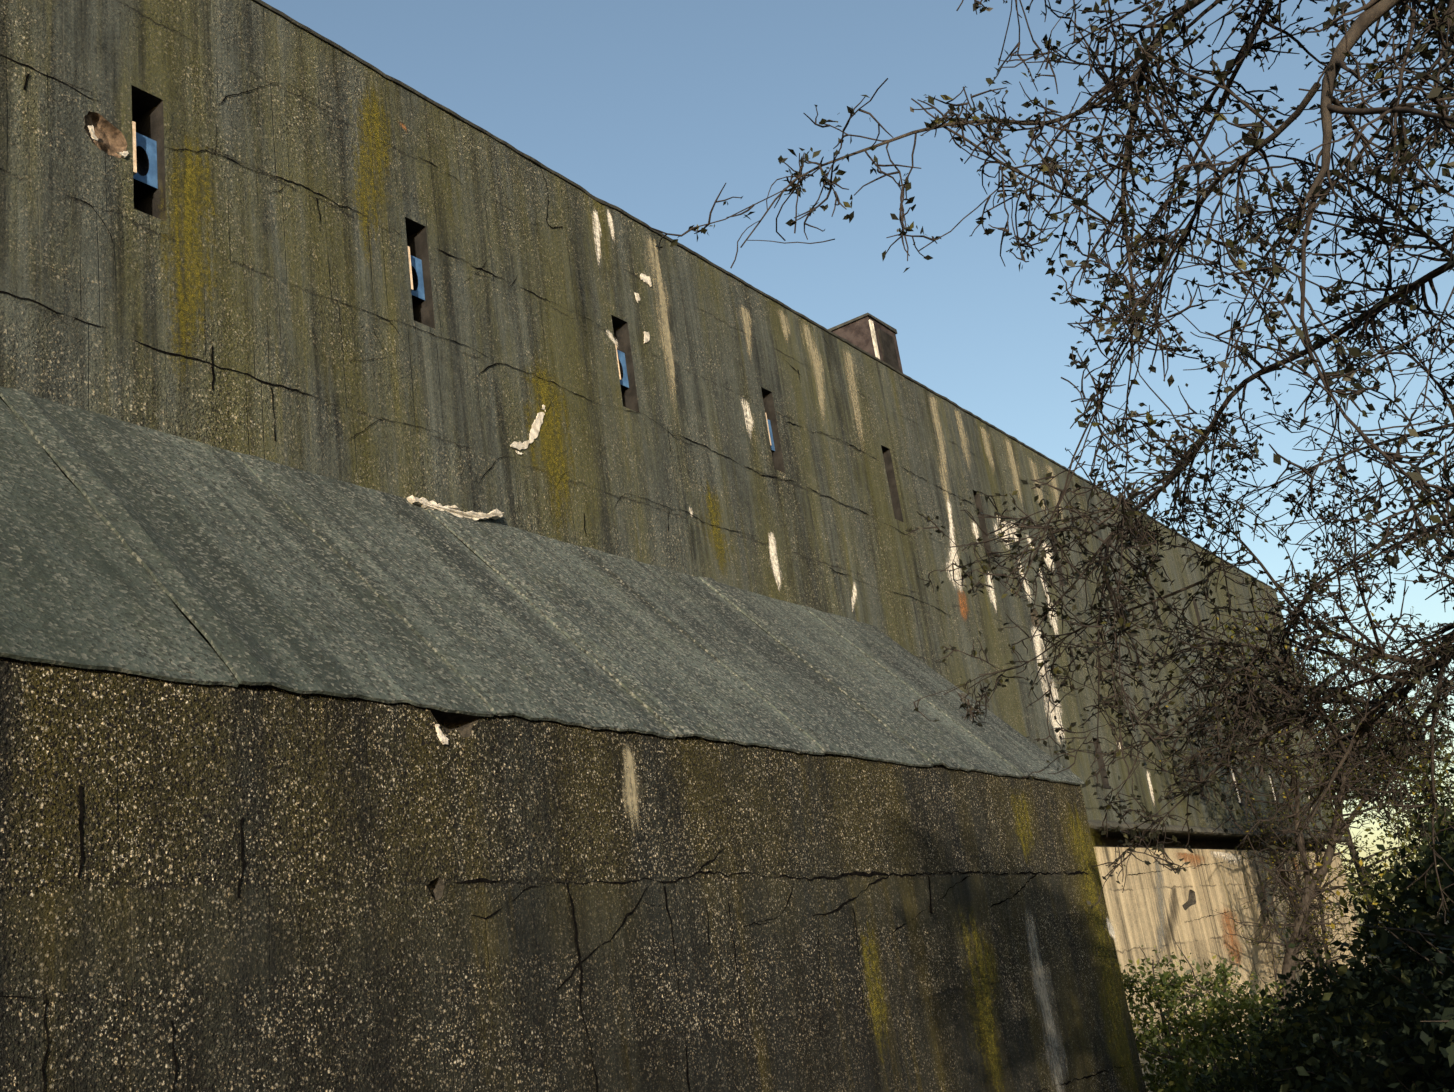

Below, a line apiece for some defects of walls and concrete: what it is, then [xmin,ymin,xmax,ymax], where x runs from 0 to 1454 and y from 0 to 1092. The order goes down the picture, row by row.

crack [0,54,98,101]
spalling [84,111,129,158]
crack [166,82,401,235]
damp [593,210,614,262]
crack [0,287,447,441]
crack [325,297,911,537]
damp [648,237,675,396]
damp [741,400,753,432]
damp [769,533,781,586]
damp [930,397,1063,592]
damp [972,516,1065,742]
crack [454,848,1093,1092]